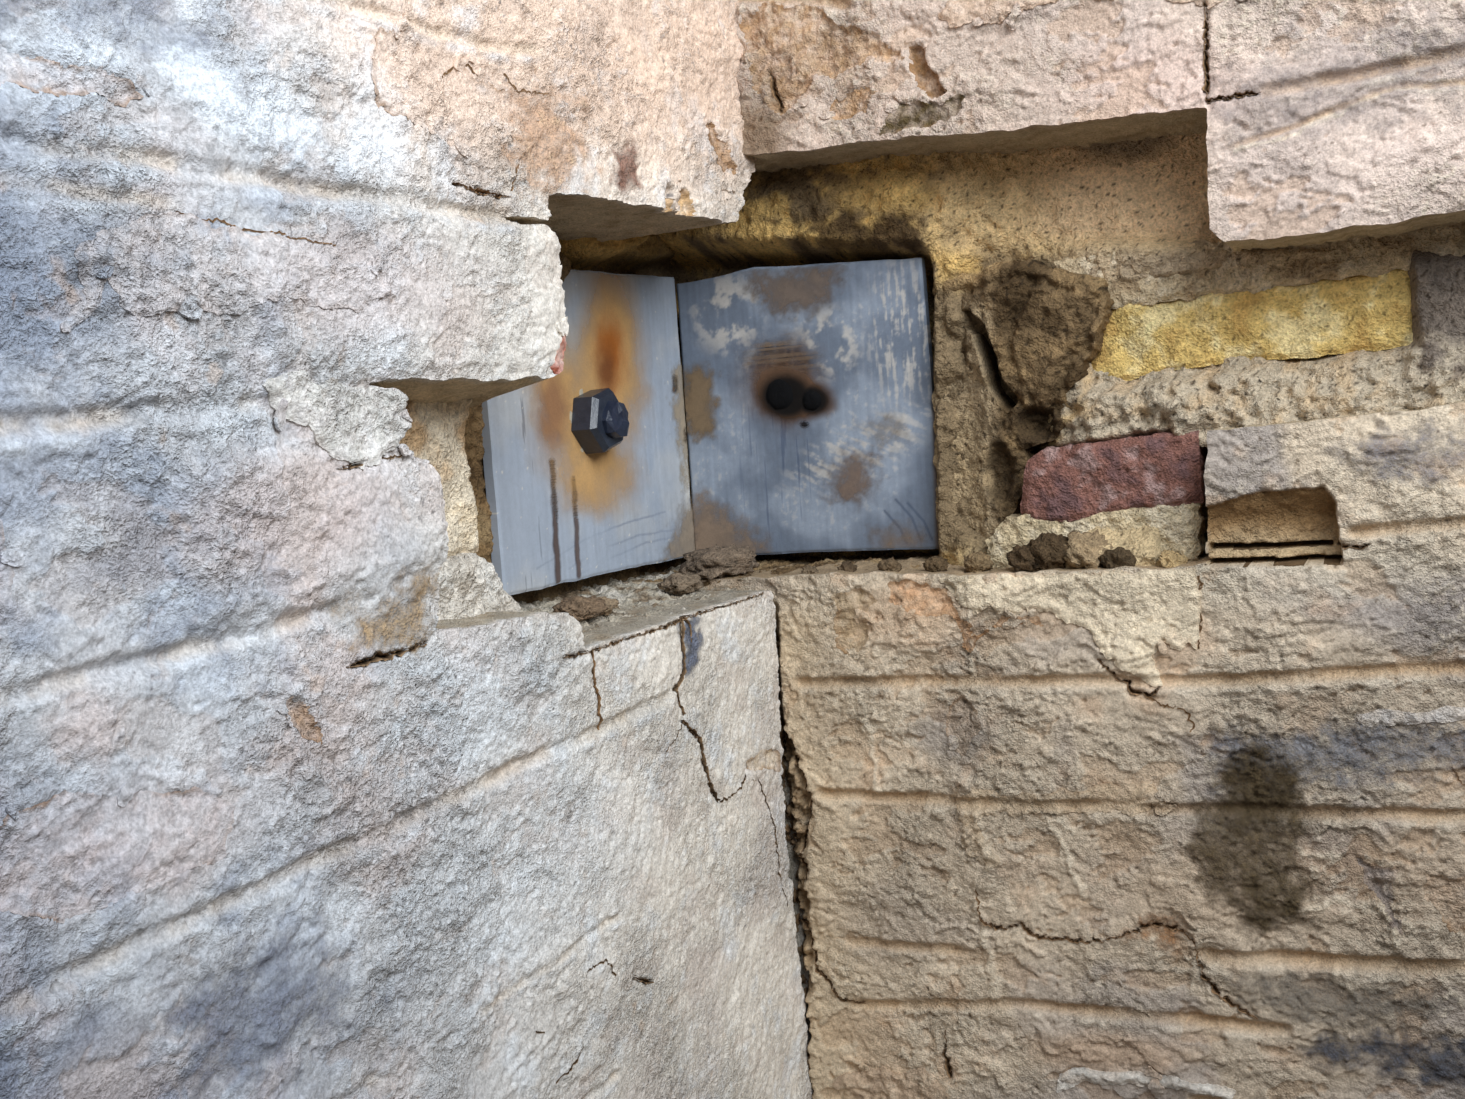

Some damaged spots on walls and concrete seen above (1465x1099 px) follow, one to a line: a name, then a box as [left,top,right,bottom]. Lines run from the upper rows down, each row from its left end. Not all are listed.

rust [536,277,640,583]
spalling [262,120,1465,687]
flaking render [276,689,323,744]
crack [1097,658,1195,733]
crack [564,592,866,1095]
damp [1188,726,1465,933]
crack [975,889,1258,1020]